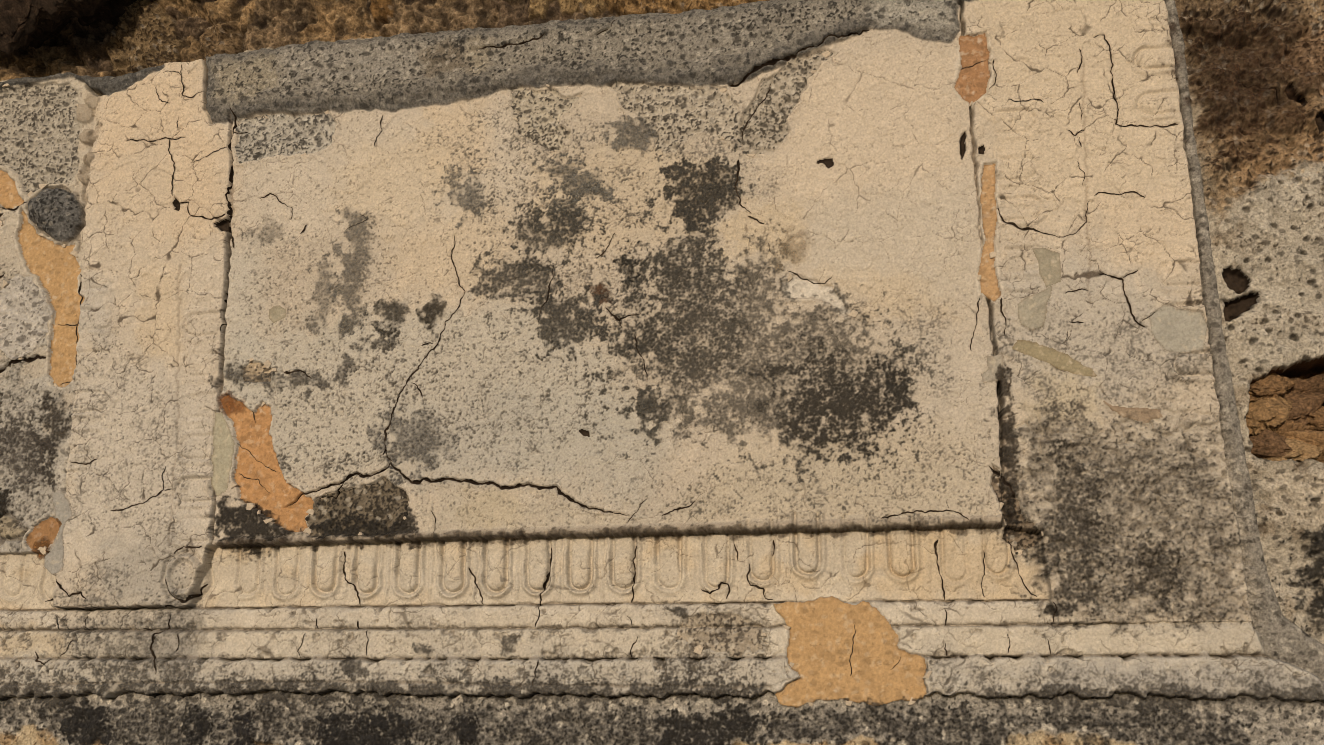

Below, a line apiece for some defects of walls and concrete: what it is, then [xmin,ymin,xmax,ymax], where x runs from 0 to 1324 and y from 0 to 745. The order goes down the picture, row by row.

spalling [0,83,85,387]
crack [127,65,306,331]
damp [603,116,659,150]
damp [470,138,930,482]
crack [998,34,1178,237]
crack [1065,270,1155,341]
peeling [220,397,409,538]
crack [237,236,695,657]
spalling [1246,356,1324,463]
damp [0,656,1324,745]
peeling [773,596,932,708]
damp [1289,529,1324,636]